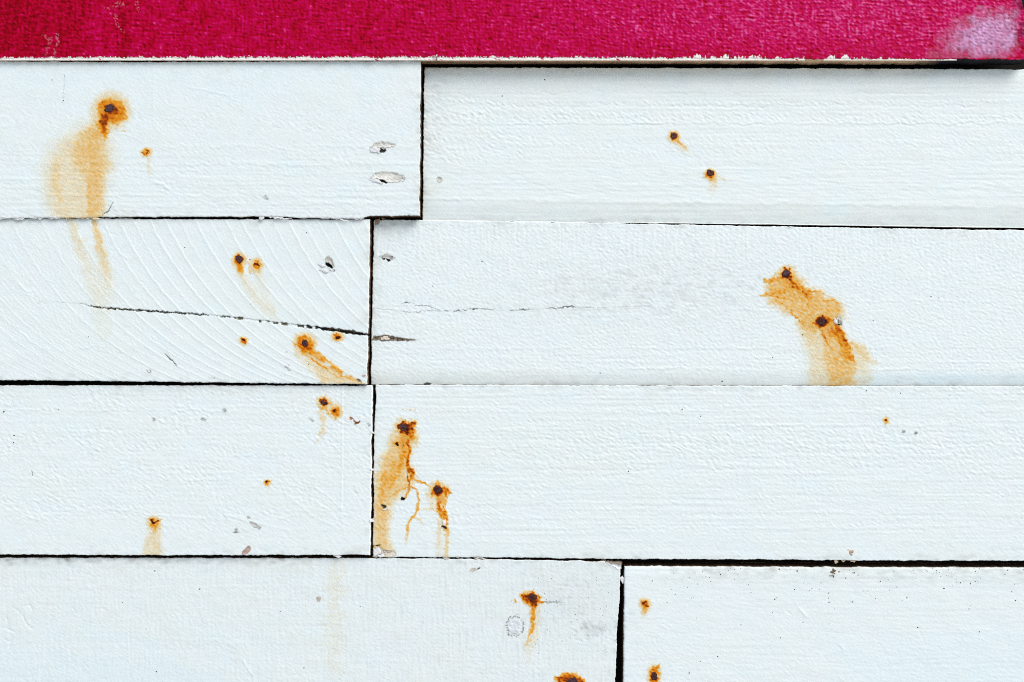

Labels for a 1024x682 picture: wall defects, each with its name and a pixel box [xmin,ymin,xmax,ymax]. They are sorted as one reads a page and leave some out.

rust [72,97,129,256]
rust [233,253,263,274]
crack [91,306,370,336]
rust [760,266,864,386]
rust [294,334,362,384]
rust [317,396,341,420]
rust [373,409,452,556]
rust [148,517,161,532]
rust [514,591,545,644]
rust [554,672,586,682]
rust [649,664,661,682]